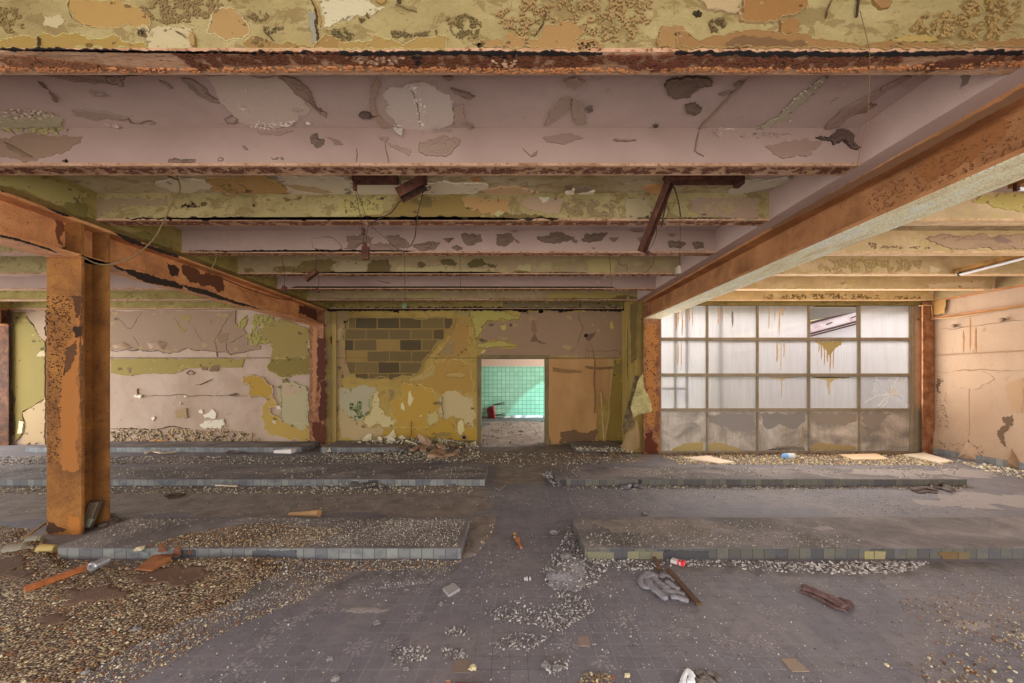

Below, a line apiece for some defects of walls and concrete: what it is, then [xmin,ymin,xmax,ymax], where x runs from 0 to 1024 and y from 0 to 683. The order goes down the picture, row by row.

flaking render [0,0,447,66]
corrosion [0,46,1024,74]
flaking render [656,0,1024,51]
corrosion [0,87,1024,309]
corrosion [57,295,84,472]
flaking render [110,310,310,441]
corrosion [240,271,667,454]
flaking render [325,289,638,441]
water stain [709,412,890,432]
water stain [769,442,857,451]
water stain [815,341,844,355]
crack [861,377,908,408]